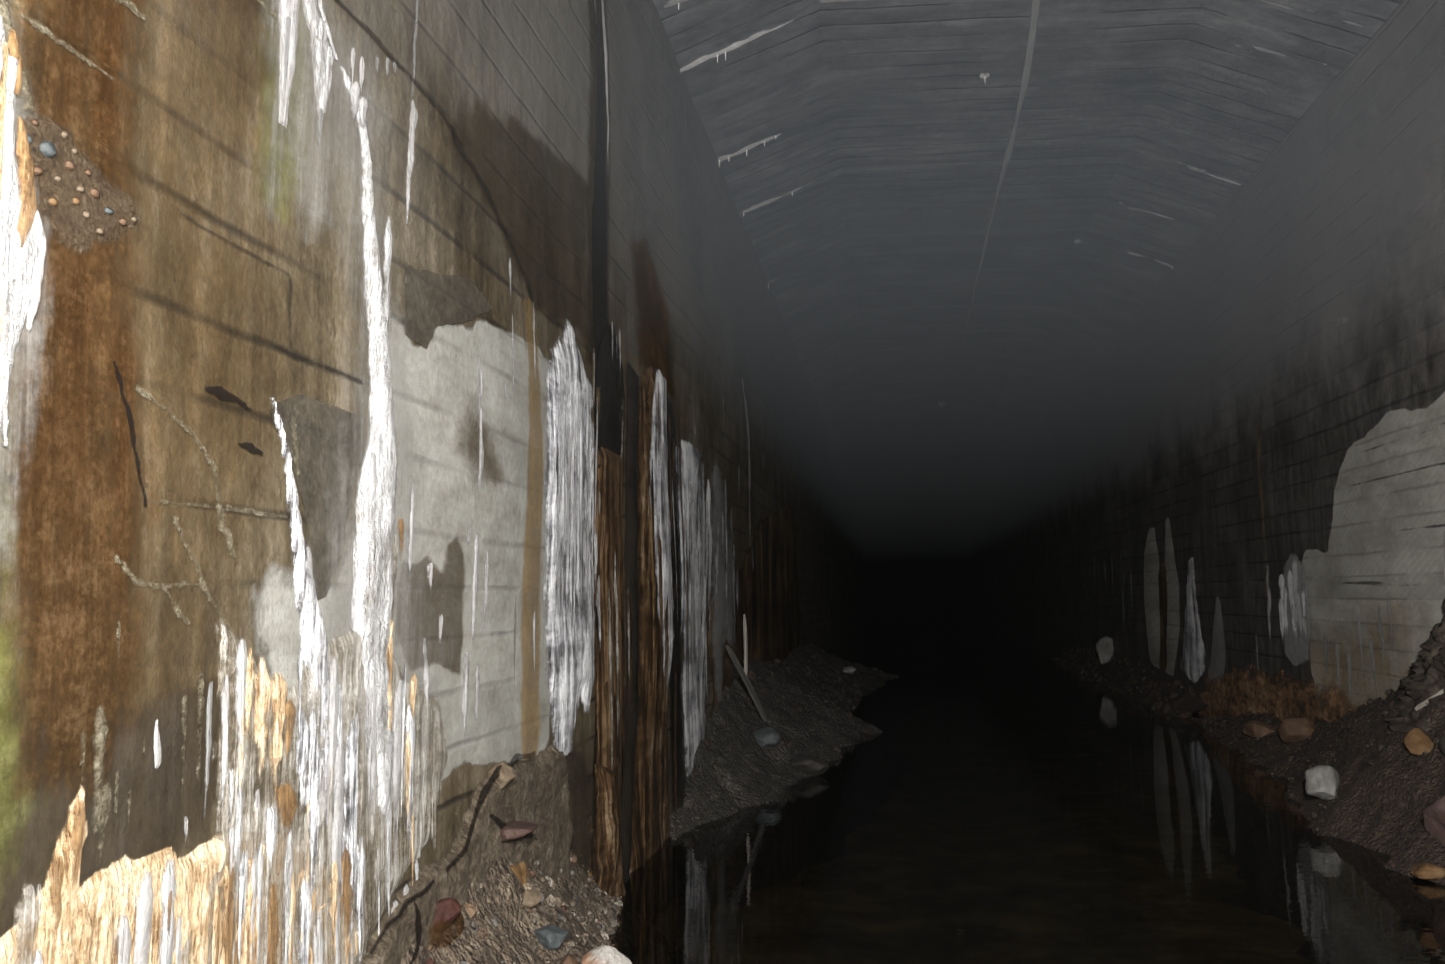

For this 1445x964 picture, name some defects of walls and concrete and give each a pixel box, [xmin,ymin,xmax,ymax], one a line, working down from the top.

corrosion [41,0,126,191]
corrosion [27,215,133,769]
crack [113,361,286,630]
water stain [0,0,448,964]
peeling [256,567,311,725]
peeling [270,267,574,964]
efflorescence [462,527,489,732]
water stain [544,322,625,872]
efflorescence [676,378,764,776]
peeling [1302,391,1445,708]